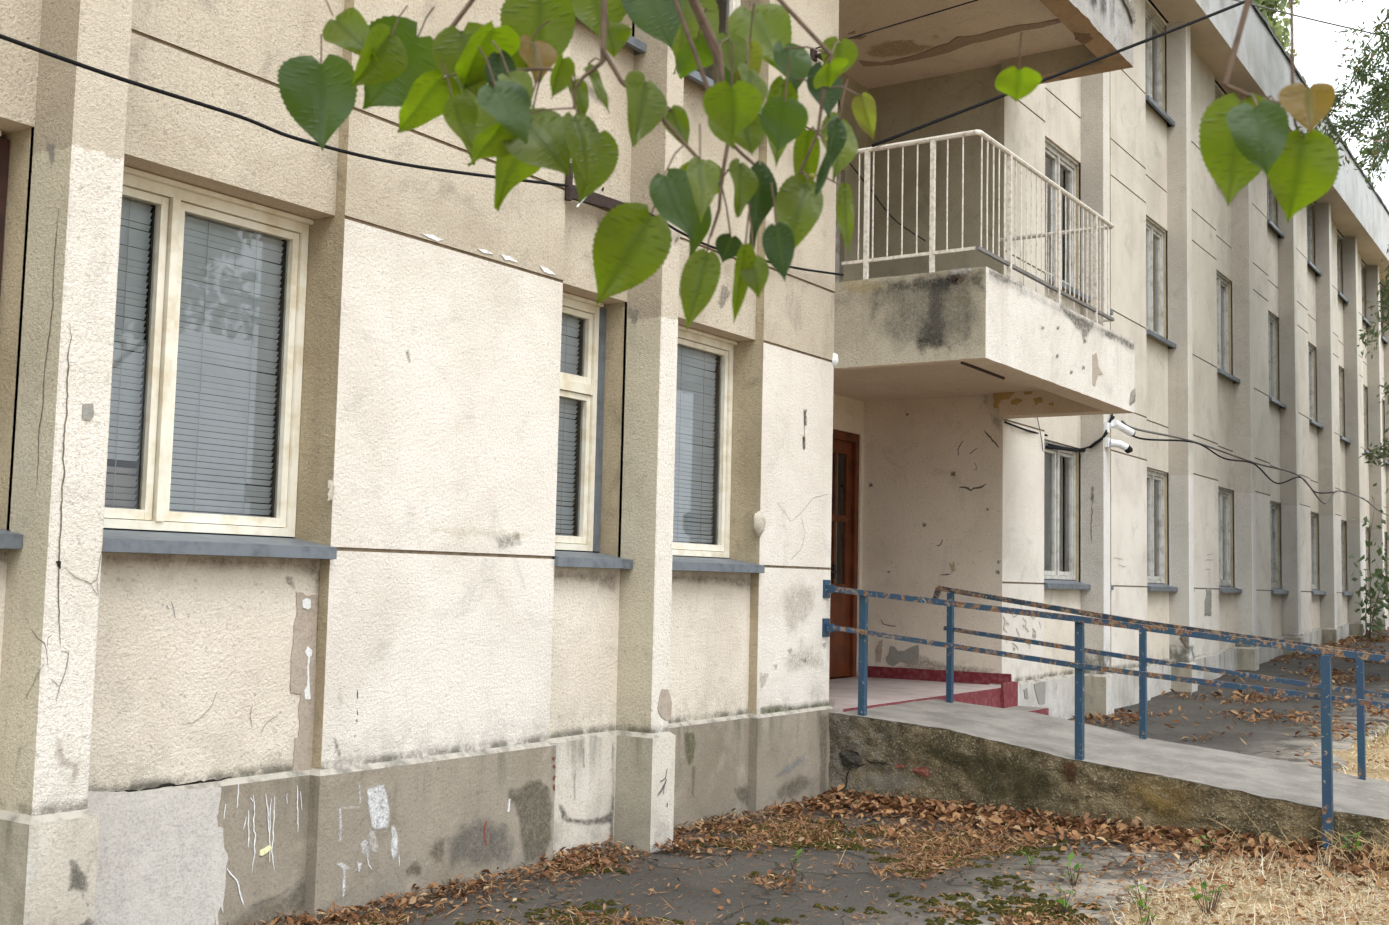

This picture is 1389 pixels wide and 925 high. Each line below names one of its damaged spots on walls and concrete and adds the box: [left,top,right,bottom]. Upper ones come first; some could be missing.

water stain [845,274,981,347]
peeling [993,391,1054,408]
crack [25,211,103,701]
peeling [287,577,318,772]
water stain [434,782,550,860]